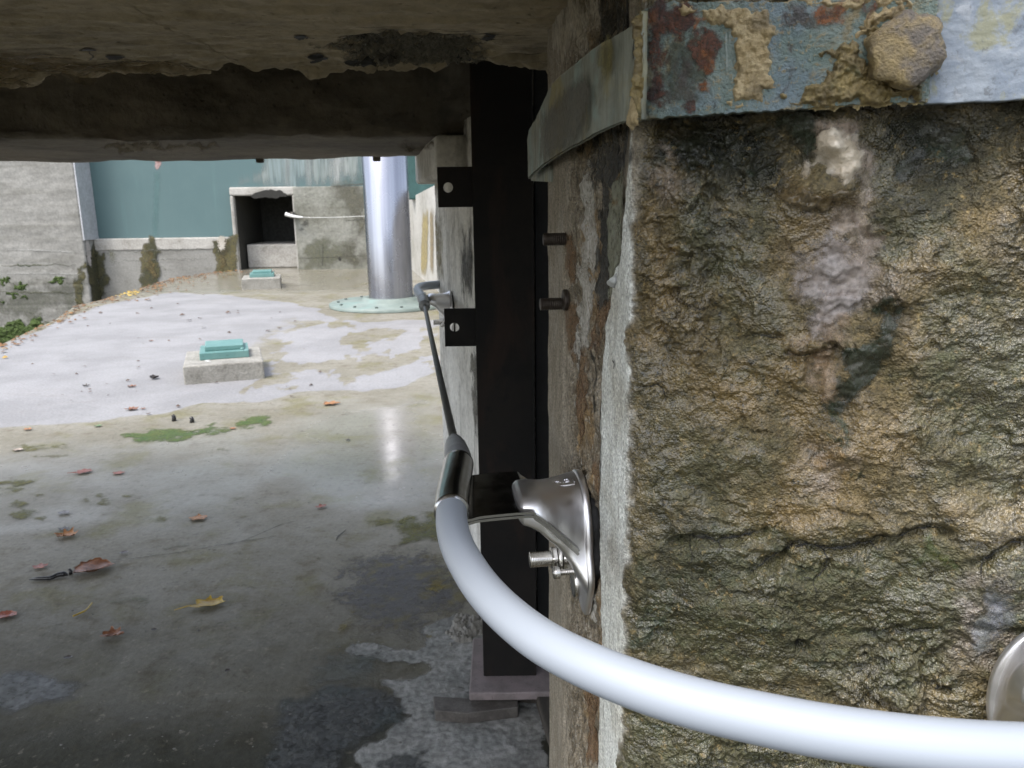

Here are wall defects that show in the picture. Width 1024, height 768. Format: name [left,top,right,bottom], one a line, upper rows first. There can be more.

rust [647,0,722,114]
leakage [678,0,930,335]
leakage [3,240,102,305]
leakage [217,236,228,270]
crack [675,531,755,566]
crack [752,526,945,602]
crack [976,539,1024,577]